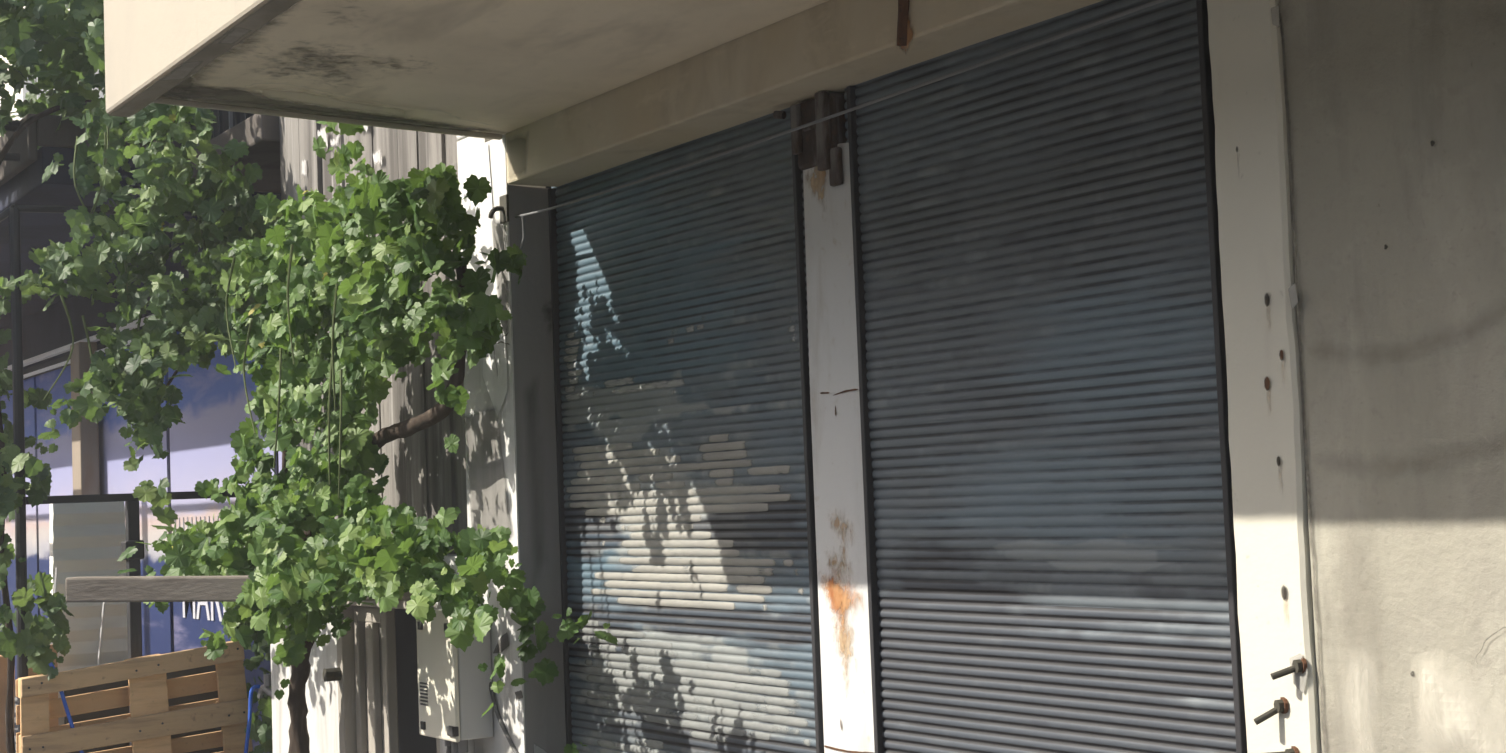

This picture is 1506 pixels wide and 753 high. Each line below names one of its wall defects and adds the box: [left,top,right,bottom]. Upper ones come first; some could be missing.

corrosion [825,517,860,674]
crack [1280,19,1326,752]